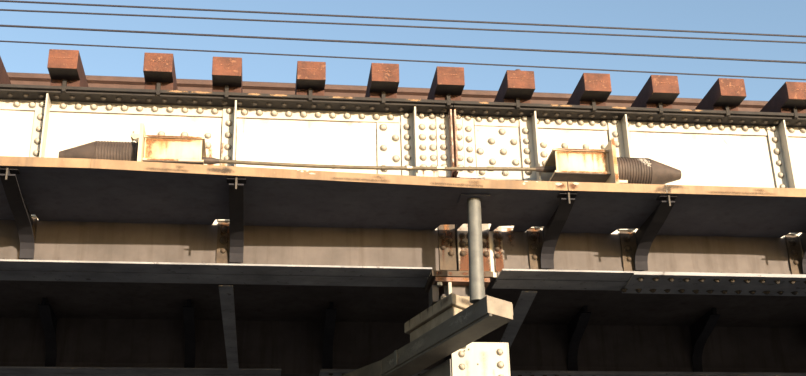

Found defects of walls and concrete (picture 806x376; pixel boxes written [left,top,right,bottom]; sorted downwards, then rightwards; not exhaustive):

corrosion [437,225,469,281]
corrosion [483,228,514,281]